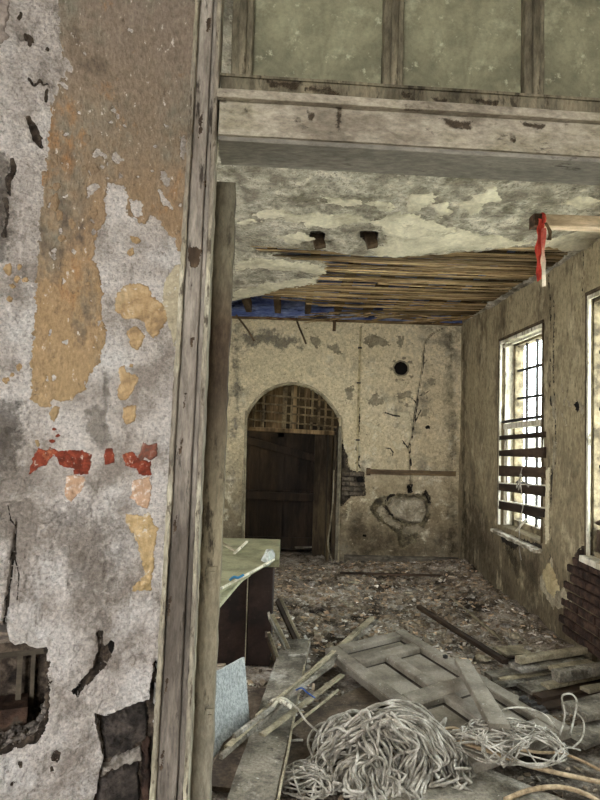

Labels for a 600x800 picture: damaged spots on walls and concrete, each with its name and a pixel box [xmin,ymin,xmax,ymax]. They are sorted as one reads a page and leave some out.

peeling [0,0,203,408]
peeling [117,364,139,425]
peeling [232,258,327,301]
flaking render [310,336,343,355]
flaking render [335,393,431,550]
flaking render [363,334,414,382]
crack [384,330,440,485]
peeling [237,186,600,258]
crack [3,505,20,625]
flaking render [558,521,600,659]
spalling [0,621,52,755]
flaking render [93,660,169,800]